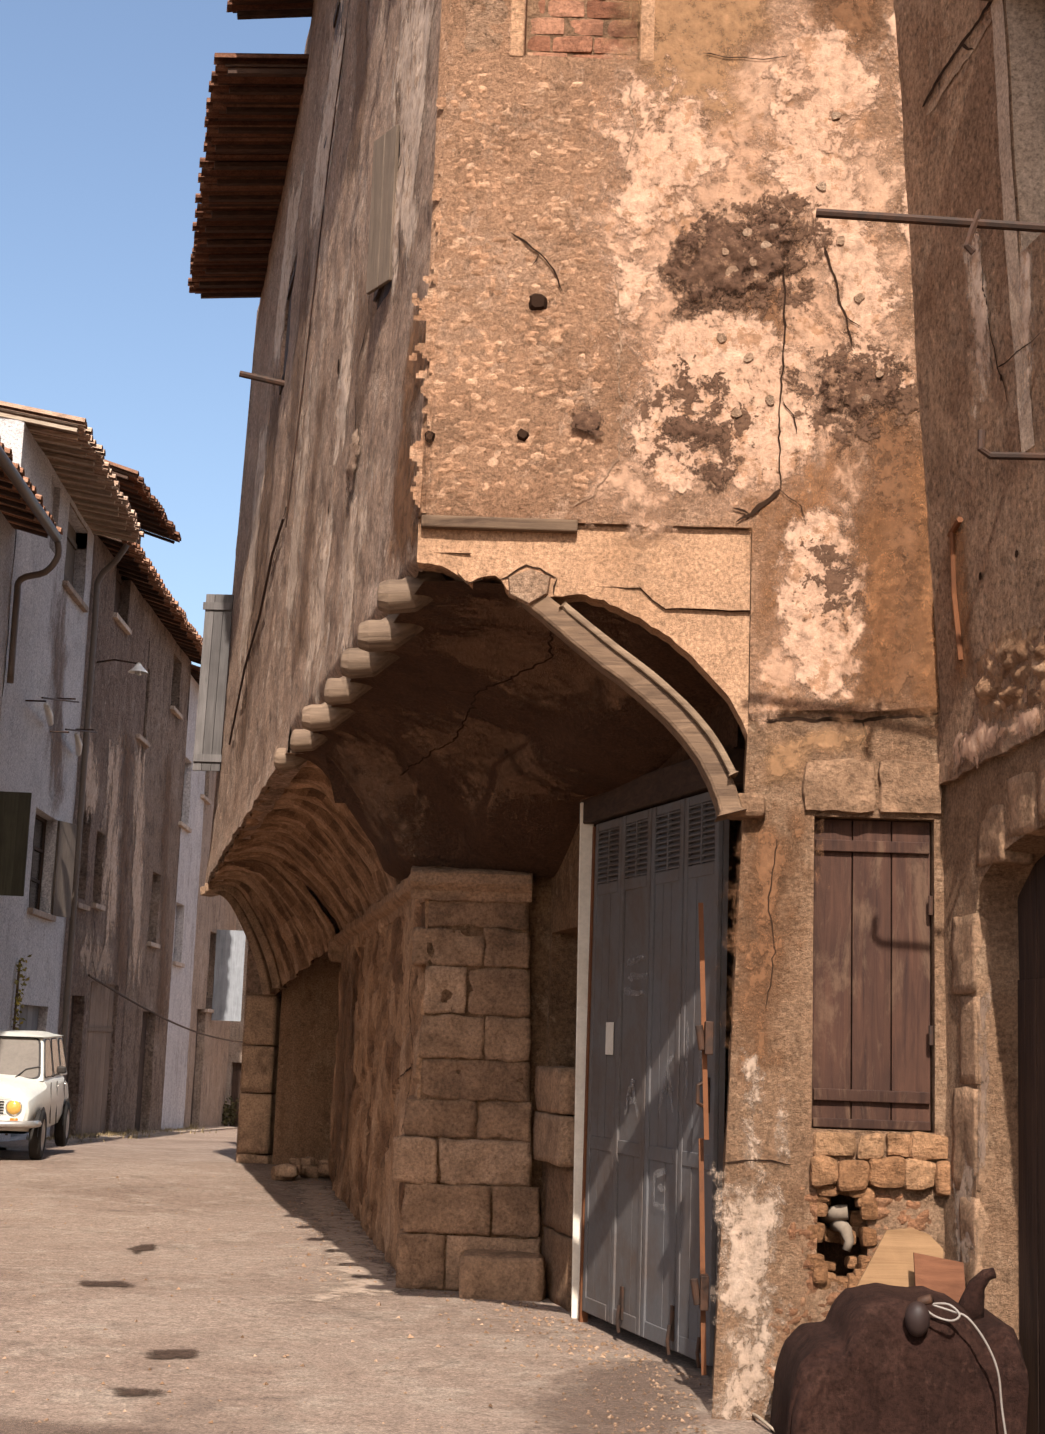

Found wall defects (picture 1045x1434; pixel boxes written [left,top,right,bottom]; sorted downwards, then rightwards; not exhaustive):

flaking render [569,1,920,724]
crack [733,269,806,522]
crack [824,246,861,345]
crack [401,631,553,775]
flaking render [417,564,641,715]
spalling [762,1184,932,1379]